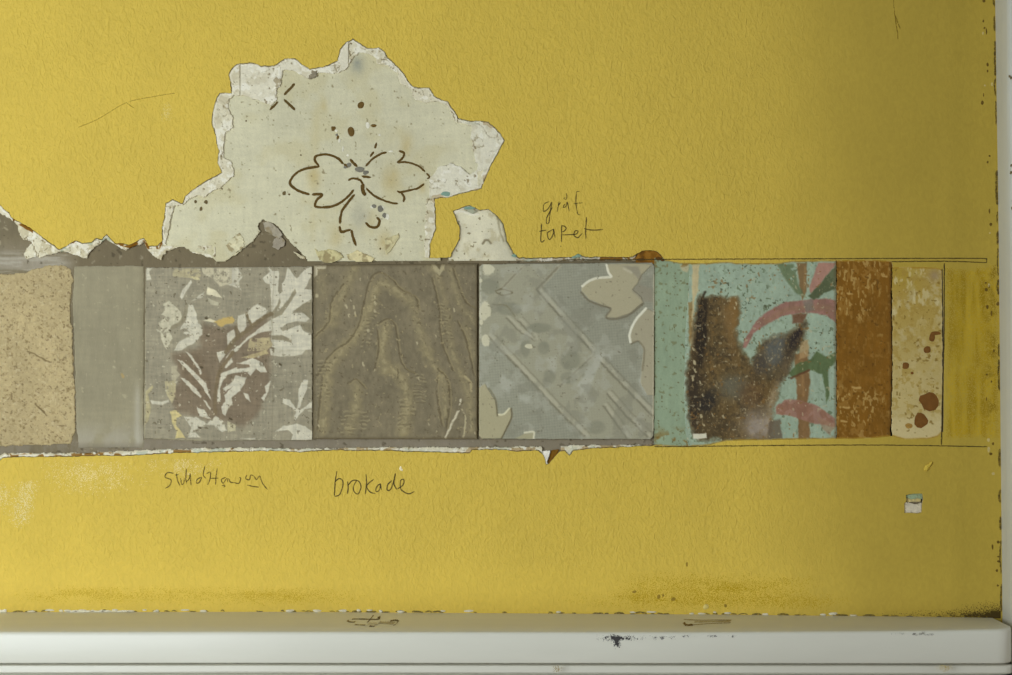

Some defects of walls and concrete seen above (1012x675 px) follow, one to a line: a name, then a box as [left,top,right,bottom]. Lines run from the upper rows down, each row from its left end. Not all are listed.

peeling [981,17,997,123]
peeling [0,39,664,464]
peeling [985,171,999,316]